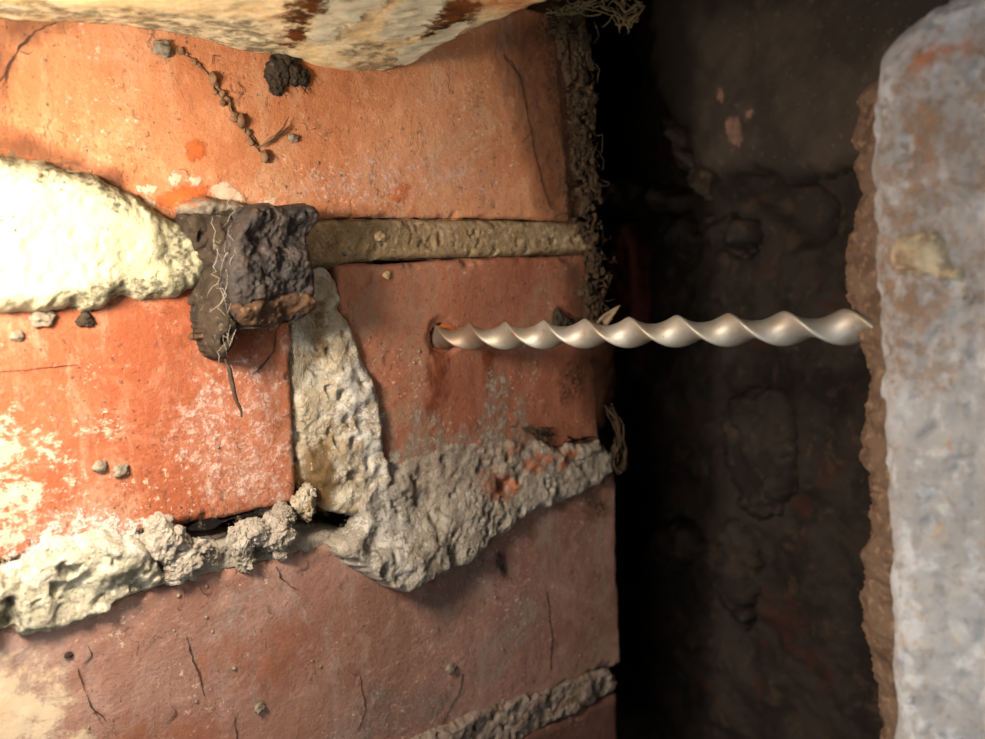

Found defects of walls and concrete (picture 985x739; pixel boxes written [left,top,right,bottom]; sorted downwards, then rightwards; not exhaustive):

crack [0,22,56,86]
rust [278,0,330,50]
rust [420,0,528,40]
crack [323,56,567,223]
rust [187,214,317,360]
damp [171,355,288,511]
damp [0,405,149,583]
crack [78,669,106,723]
crack [187,640,204,695]